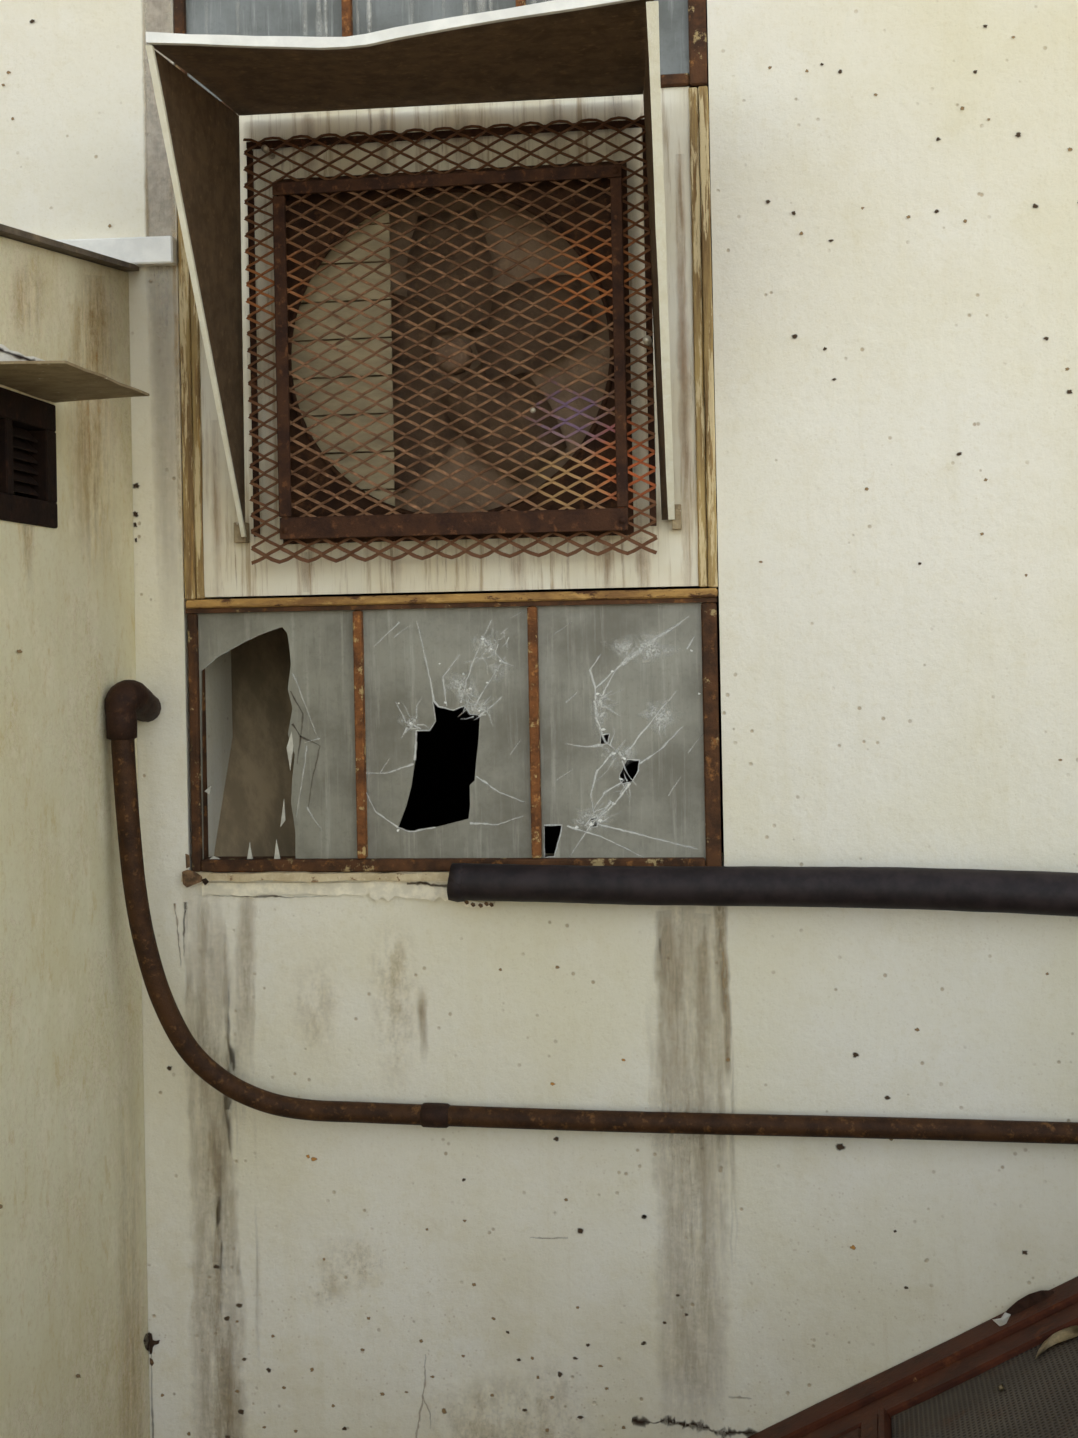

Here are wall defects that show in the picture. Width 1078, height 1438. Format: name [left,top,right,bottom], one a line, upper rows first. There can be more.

flaking render [182,854,495,908]
water stain [718,906,729,1058]